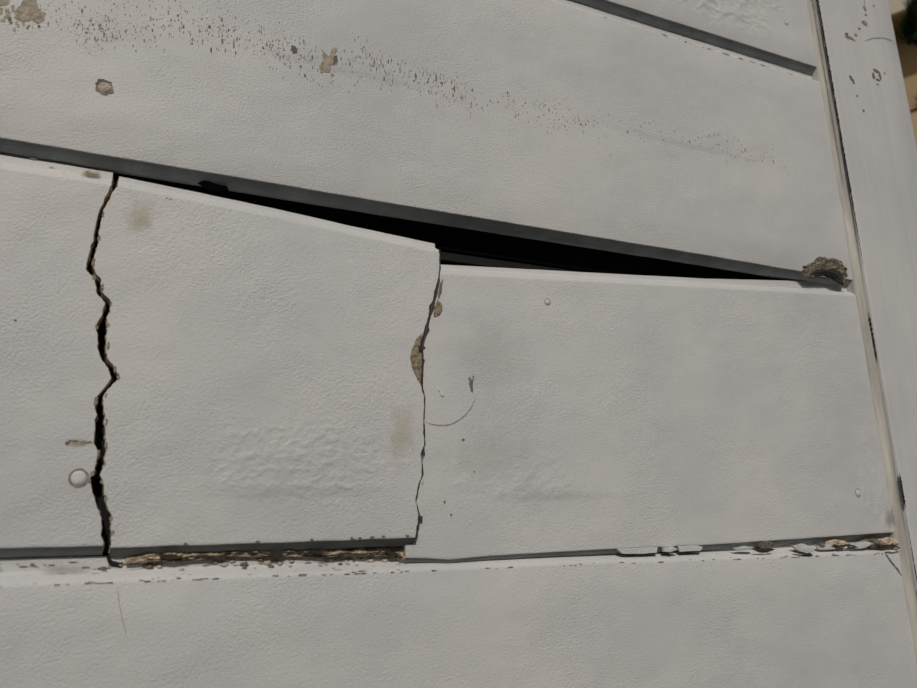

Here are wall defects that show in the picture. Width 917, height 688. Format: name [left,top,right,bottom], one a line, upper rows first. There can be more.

peeling [0,0,609,134]
spalling [800,256,849,287]
crack [86,175,123,568]
crack [401,249,475,561]
spalling [72,535,410,584]